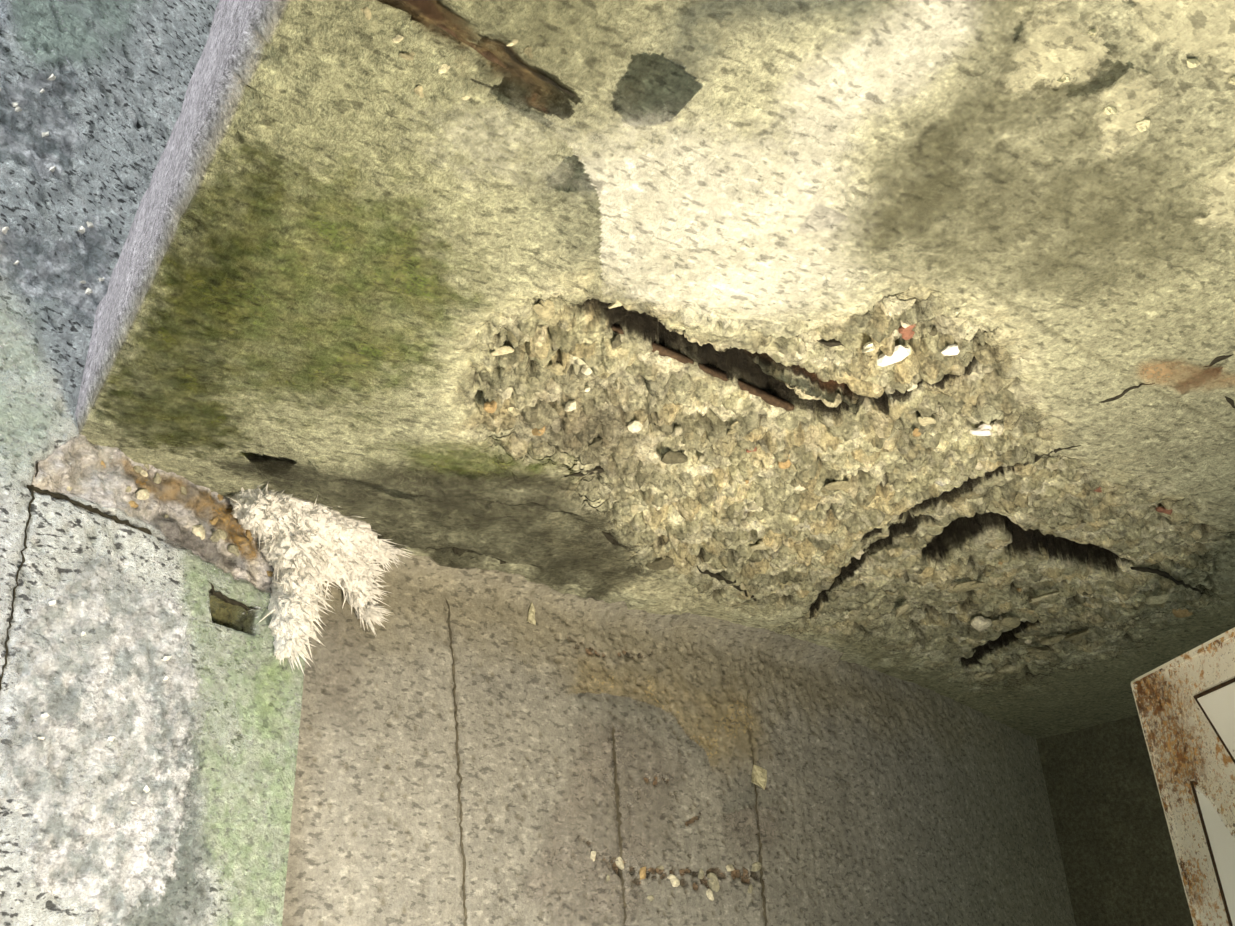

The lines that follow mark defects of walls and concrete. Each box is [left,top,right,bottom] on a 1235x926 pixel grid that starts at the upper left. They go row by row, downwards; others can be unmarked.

water stain [693,0,872,18]
water stain [875,67,1148,285]
crack [580,297,977,420]
rust [1203,354,1233,375]
water stain [226,462,642,600]
spalling [458,286,1235,689]
crack [809,445,1081,619]
rust [1133,632,1235,926]